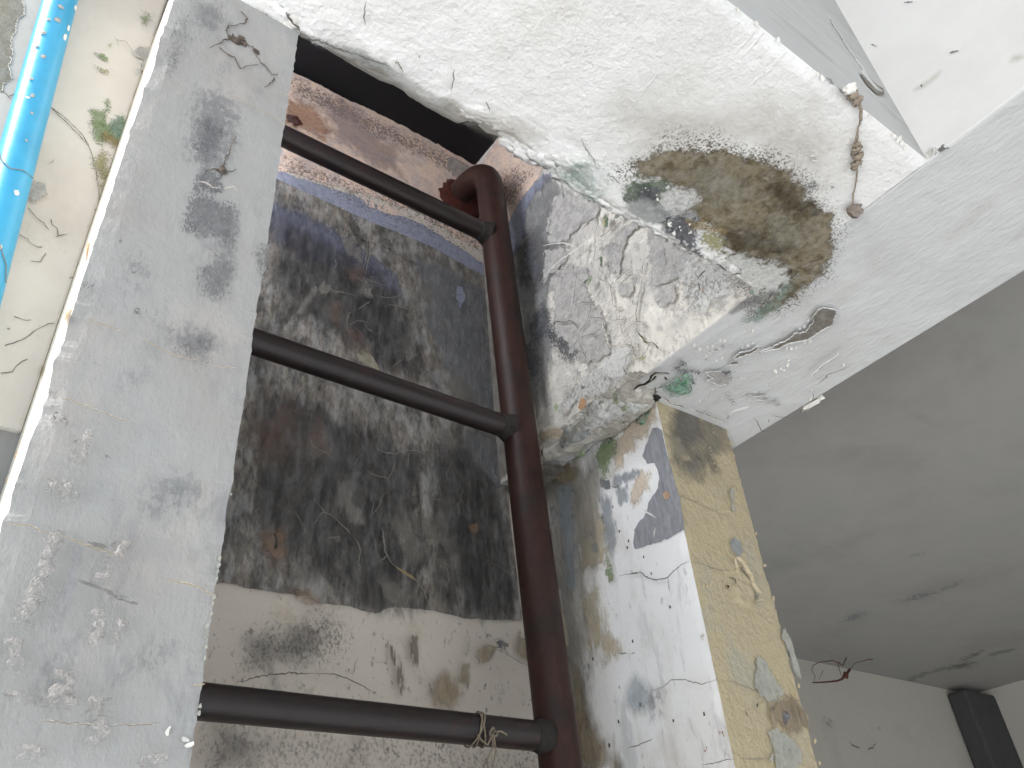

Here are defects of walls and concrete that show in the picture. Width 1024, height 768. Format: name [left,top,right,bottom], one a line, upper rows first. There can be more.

water stain [182,170,240,300]
water stain [254,179,500,413]
water stain [514,176,579,417]
crack [550,207,726,423]
water stain [616,132,839,319]
spalling [693,307,837,402]
water stain [216,355,522,621]
peeling [587,404,684,549]
crack [620,562,728,586]
crack [236,672,377,695]
peeling [767,728,803,768]
peeling [782,628,801,688]